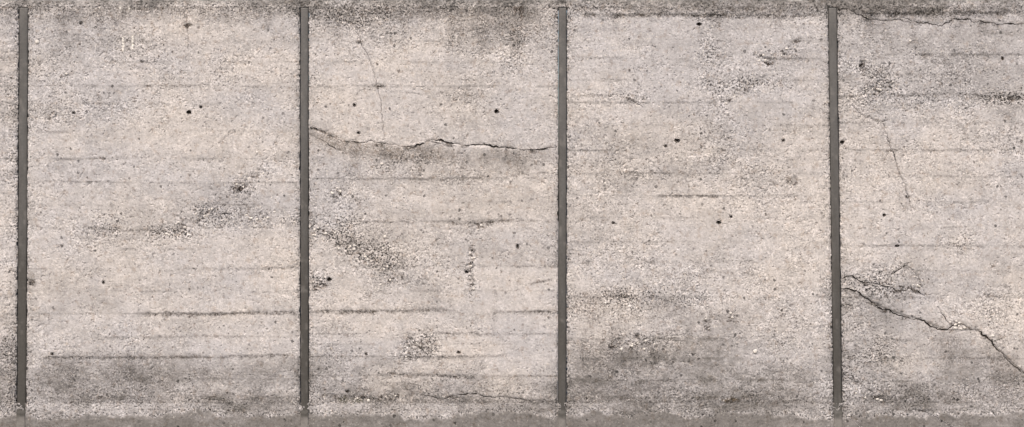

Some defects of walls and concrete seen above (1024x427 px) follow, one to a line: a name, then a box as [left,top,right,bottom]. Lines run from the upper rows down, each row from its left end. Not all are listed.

crack [311,18,556,156]
crack [842,262,1024,374]